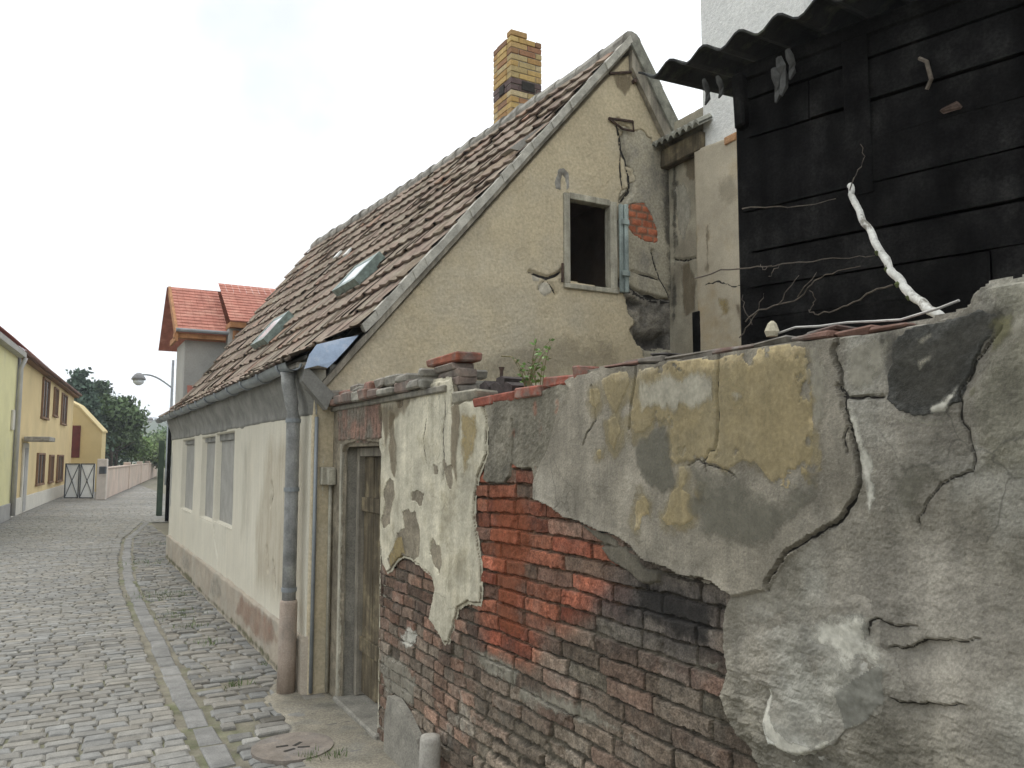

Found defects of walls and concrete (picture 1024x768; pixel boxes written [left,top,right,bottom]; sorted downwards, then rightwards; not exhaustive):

crack [528,272,560,294]
crack [616,126,630,203]
flaking render [628,203,658,243]
peeling [589,282,821,531]
crack [770,343,884,580]
crack [919,335,998,522]
spalling [377,376,905,768]
crack [868,618,976,649]